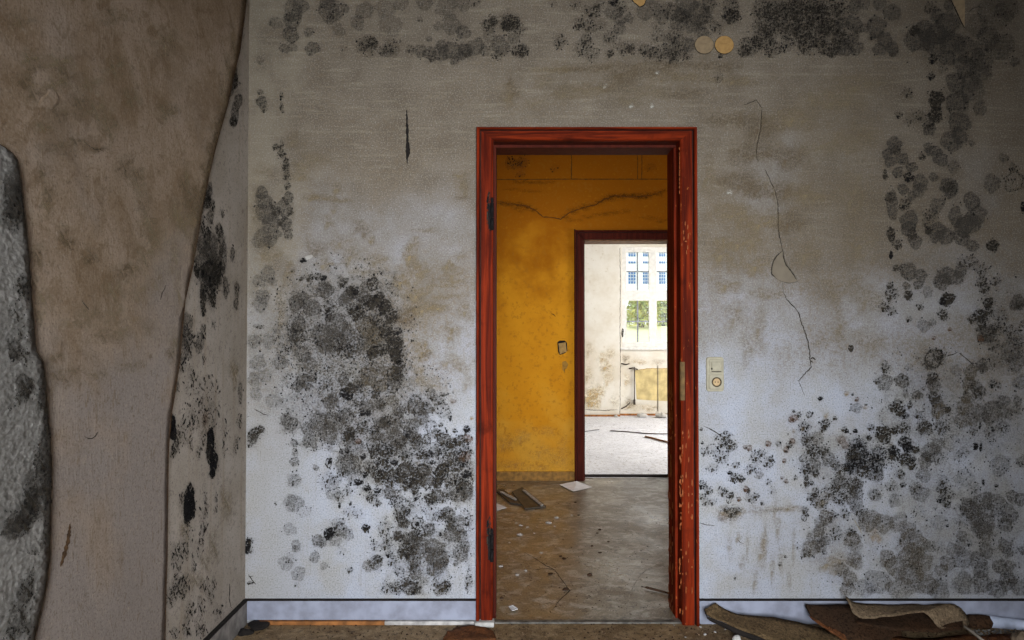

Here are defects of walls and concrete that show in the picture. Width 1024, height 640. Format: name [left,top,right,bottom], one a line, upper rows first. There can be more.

water stain [316,0,529,64]
crack [744,100,782,246]
water stain [170,144,491,596]
water stain [552,0,1024,599]
crack [782,282,816,396]
water stain [168,483,227,639]